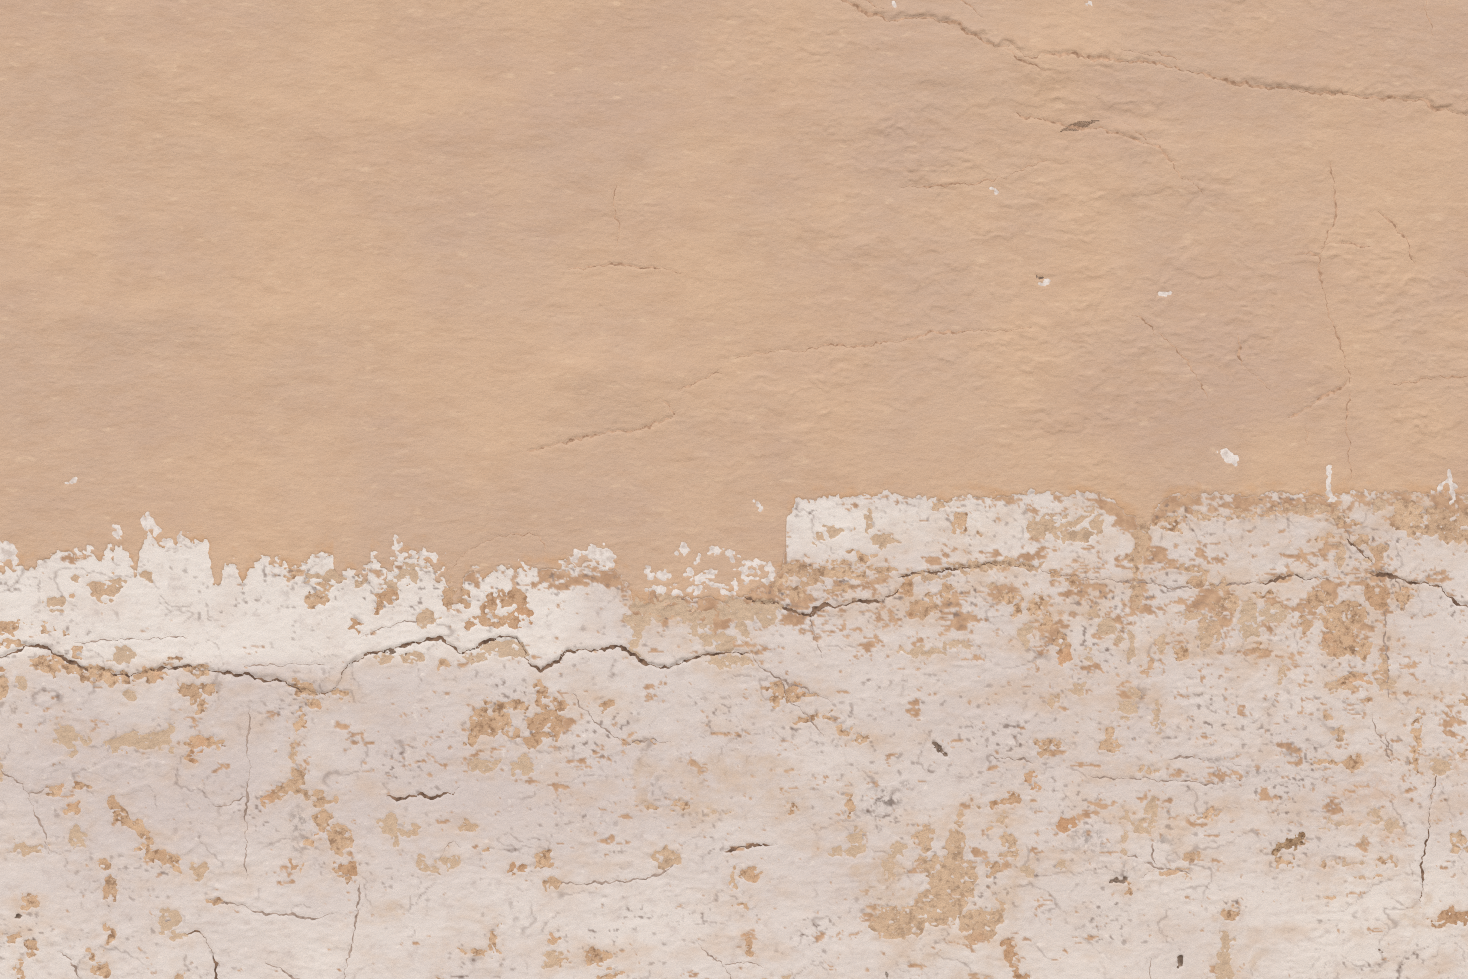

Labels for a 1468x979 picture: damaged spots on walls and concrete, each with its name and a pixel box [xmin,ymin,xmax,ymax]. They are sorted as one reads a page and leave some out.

crack [841,0,1466,116]
crack [1236,163,1468,761]
peeling [0,570,218,715]
peeling [283,534,534,671]
peeling [623,499,1415,773]
crack [745,562,1325,652]
peeling [260,677,358,885]
crack [0,620,830,979]
peeling [463,679,570,777]
peeling [868,738,1066,979]
crack [1091,755,1244,786]
crack [1419,776,1437,902]